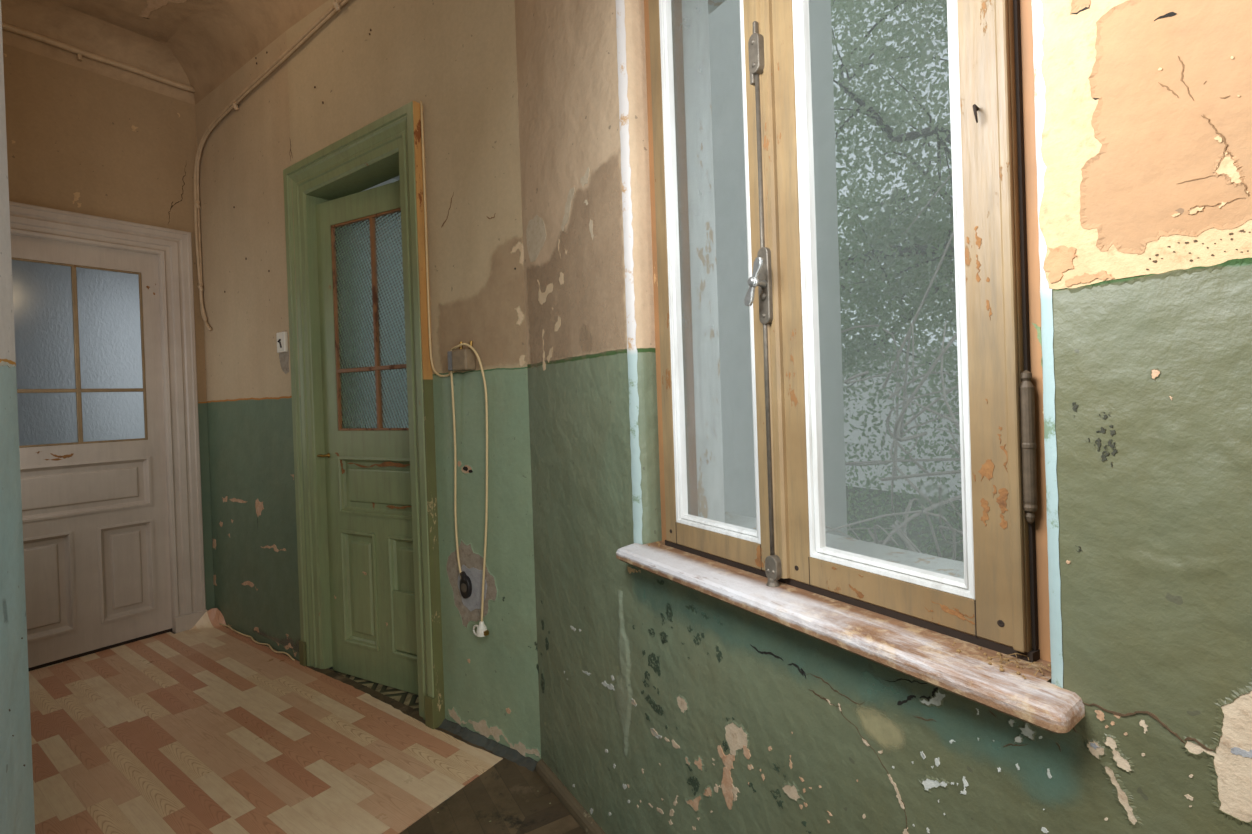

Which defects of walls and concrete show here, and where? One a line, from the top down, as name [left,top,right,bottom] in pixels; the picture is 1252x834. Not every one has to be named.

peeling [1039,0,1252,293]
water stain [527,163,624,365]
peeling [222,496,264,516]
spalling [446,539,505,629]
spalling [448,707,541,759]
spalling [622,602,822,834]
crack [989,702,1216,752]
spalling [1179,668,1252,827]